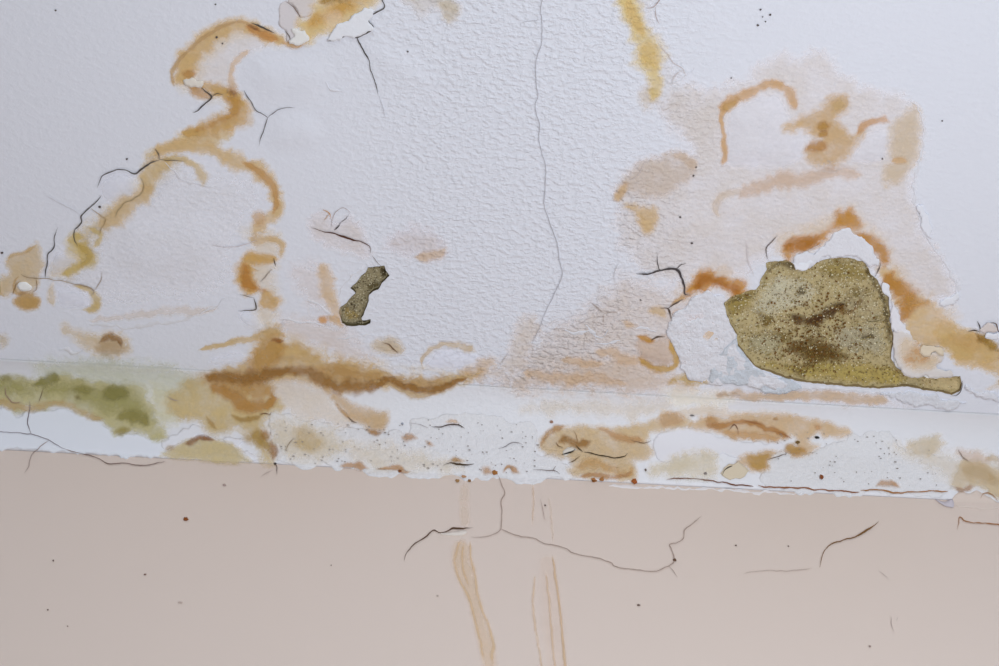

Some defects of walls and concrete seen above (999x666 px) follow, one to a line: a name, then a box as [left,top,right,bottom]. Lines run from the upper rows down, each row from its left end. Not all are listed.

peeling [278,0,315,46]
peeling [327,8,374,42]
water stain [56,0,373,308]
water stain [615,0,950,297]
crack [13,149,178,295]
crack [314,208,381,266]
spalling [305,266,389,326]
crack [640,258,687,341]
spalling [666,228,999,403]
water stain [0,283,687,464]
water stain [541,407,850,481]
crack [404,477,700,575]